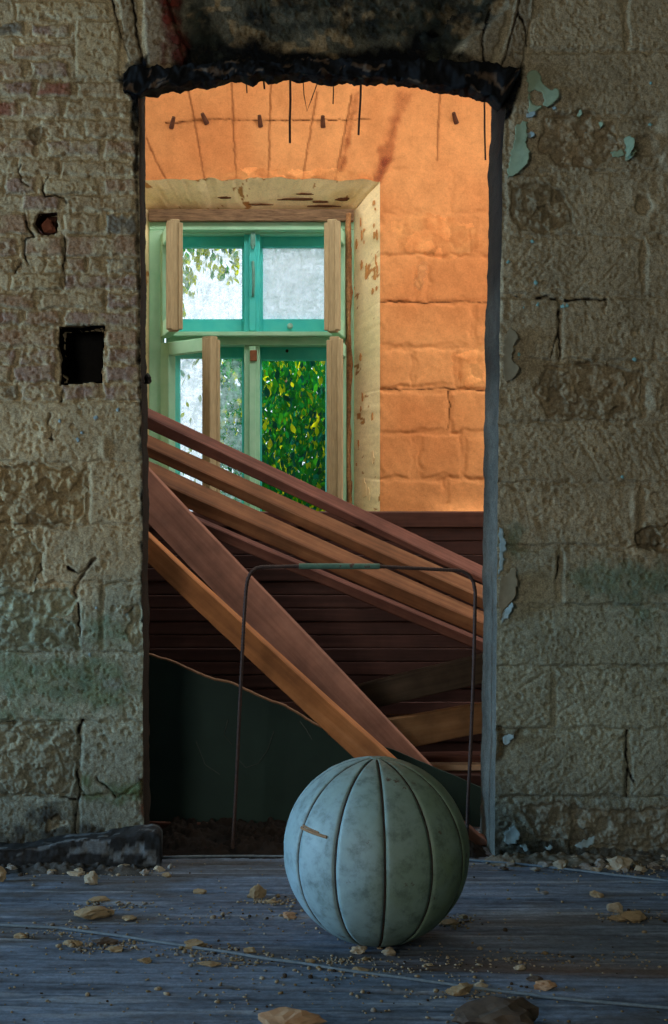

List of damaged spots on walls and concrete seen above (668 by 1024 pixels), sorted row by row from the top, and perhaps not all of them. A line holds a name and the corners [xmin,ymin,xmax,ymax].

crack [18,165,67,204]
flaking render [507,70,637,236]
crack [14,214,35,274]
crack [60,236,68,277]
crack [516,295,606,360]
flaking render [498,527,518,623]
crack [64,719,121,834]
crack [625,729,634,797]